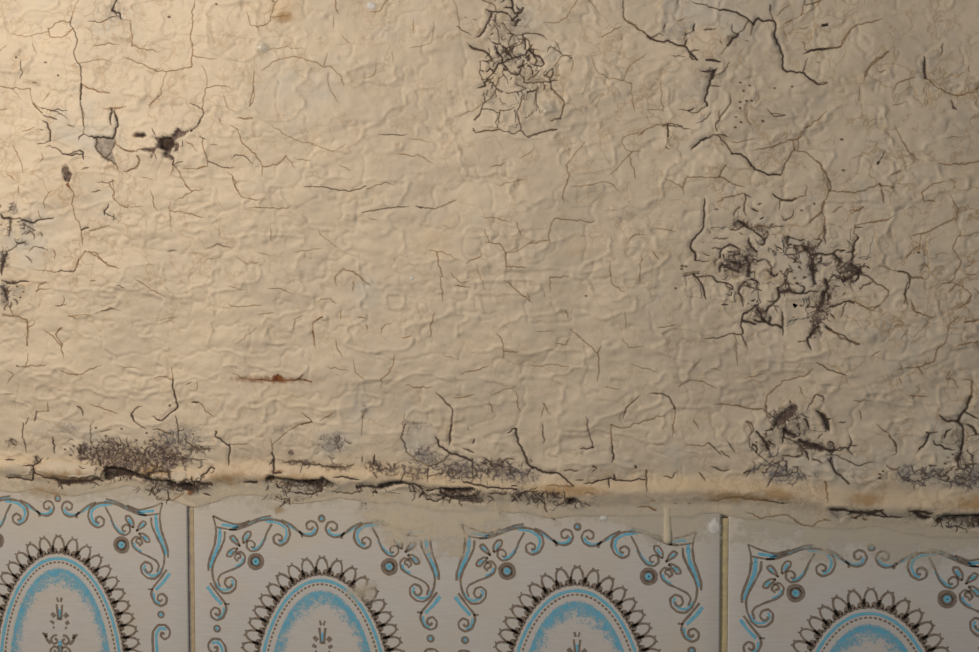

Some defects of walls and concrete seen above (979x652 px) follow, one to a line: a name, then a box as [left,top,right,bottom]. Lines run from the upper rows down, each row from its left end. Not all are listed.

crack [0,0,453,383]
crack [293,0,979,492]
rust [236,374,311,382]
crack [22,403,48,453]
mould [79,435,210,472]
crack [52,366,248,480]
crack [272,410,367,472]
mould [368,447,516,480]